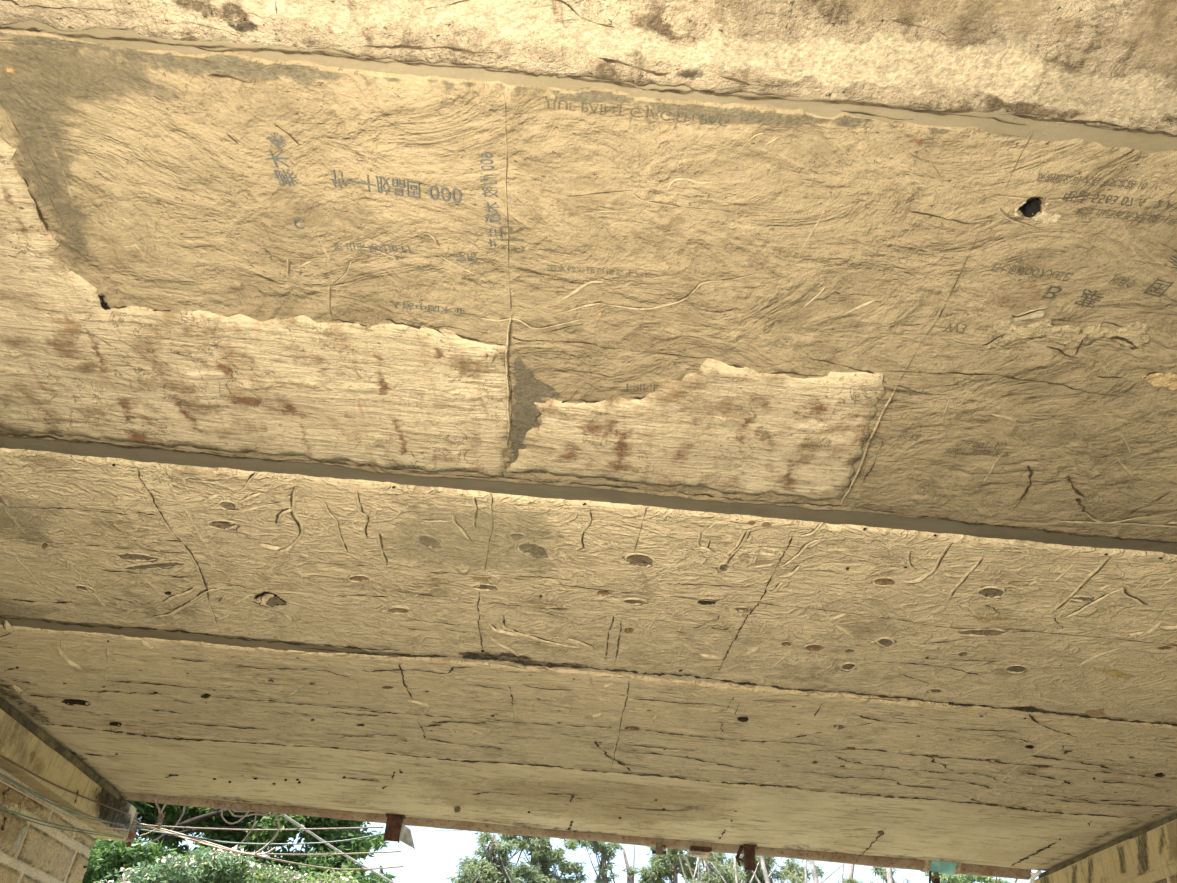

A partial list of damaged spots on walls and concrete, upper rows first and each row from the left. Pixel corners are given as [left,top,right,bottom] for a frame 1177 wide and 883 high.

water stain [228,0,1177,117]
peeling [0,124,885,501]
spalling [985,308,1150,352]
spalling [1142,372,1177,391]
crack [0,433,1177,866]